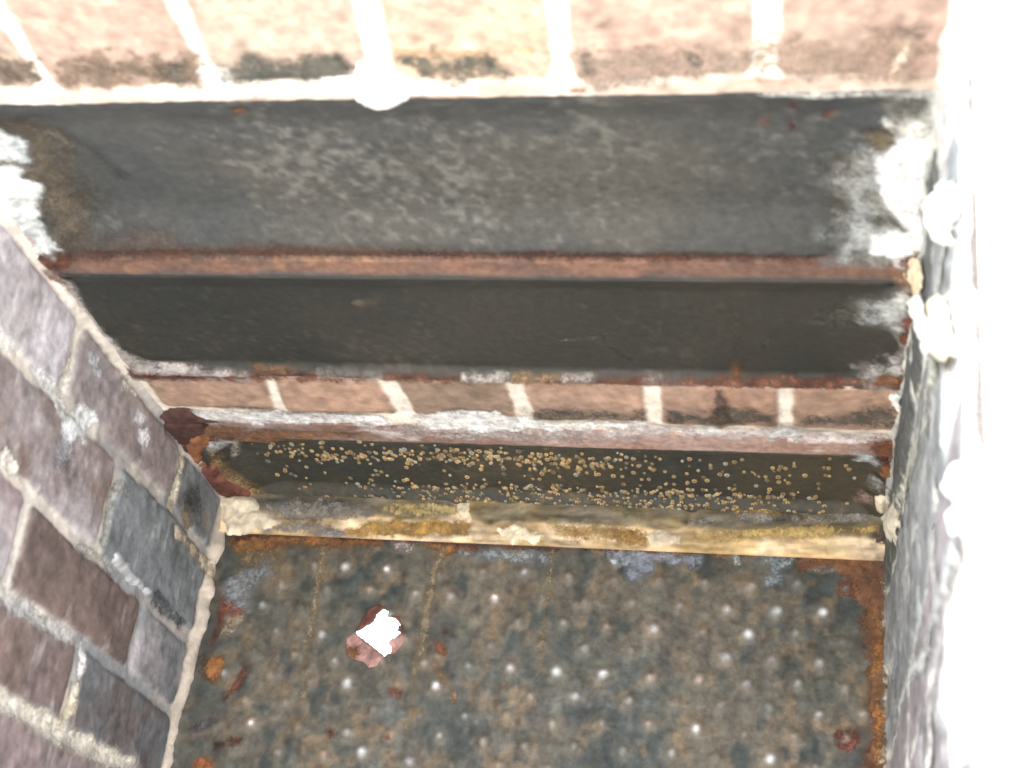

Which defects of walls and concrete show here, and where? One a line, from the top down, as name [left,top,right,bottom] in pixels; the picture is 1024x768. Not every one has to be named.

efflorescence [826,98,935,270]
rust [37,227,920,349]
efflorescence [814,285,912,395]
rust [198,654,225,682]
rust [211,596,244,644]
damp [192,409,892,728]
rust [785,557,888,768]